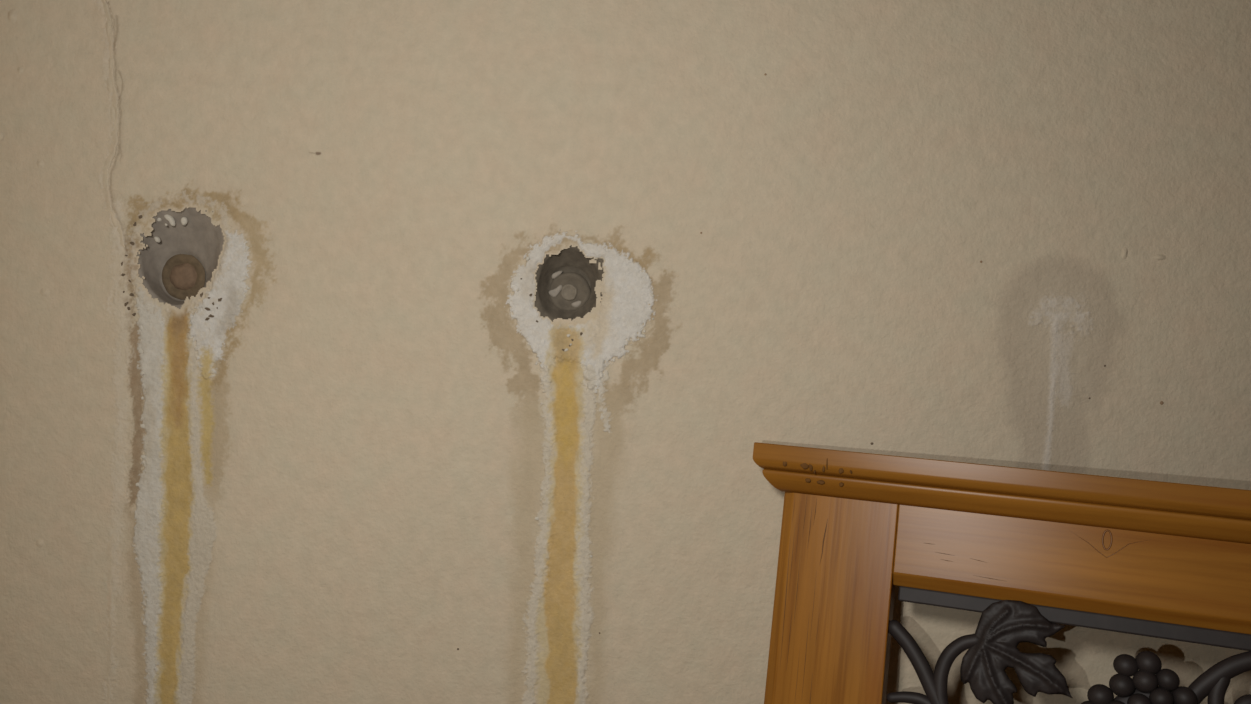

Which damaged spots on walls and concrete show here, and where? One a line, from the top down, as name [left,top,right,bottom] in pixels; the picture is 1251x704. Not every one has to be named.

spalling [136,207,225,309]
rust [150,297,219,704]
water stain [100,178,283,704]
rust [528,259,603,704]
spalling [535,245,604,322]
water stain [476,218,685,704]
water stain [982,246,1142,475]